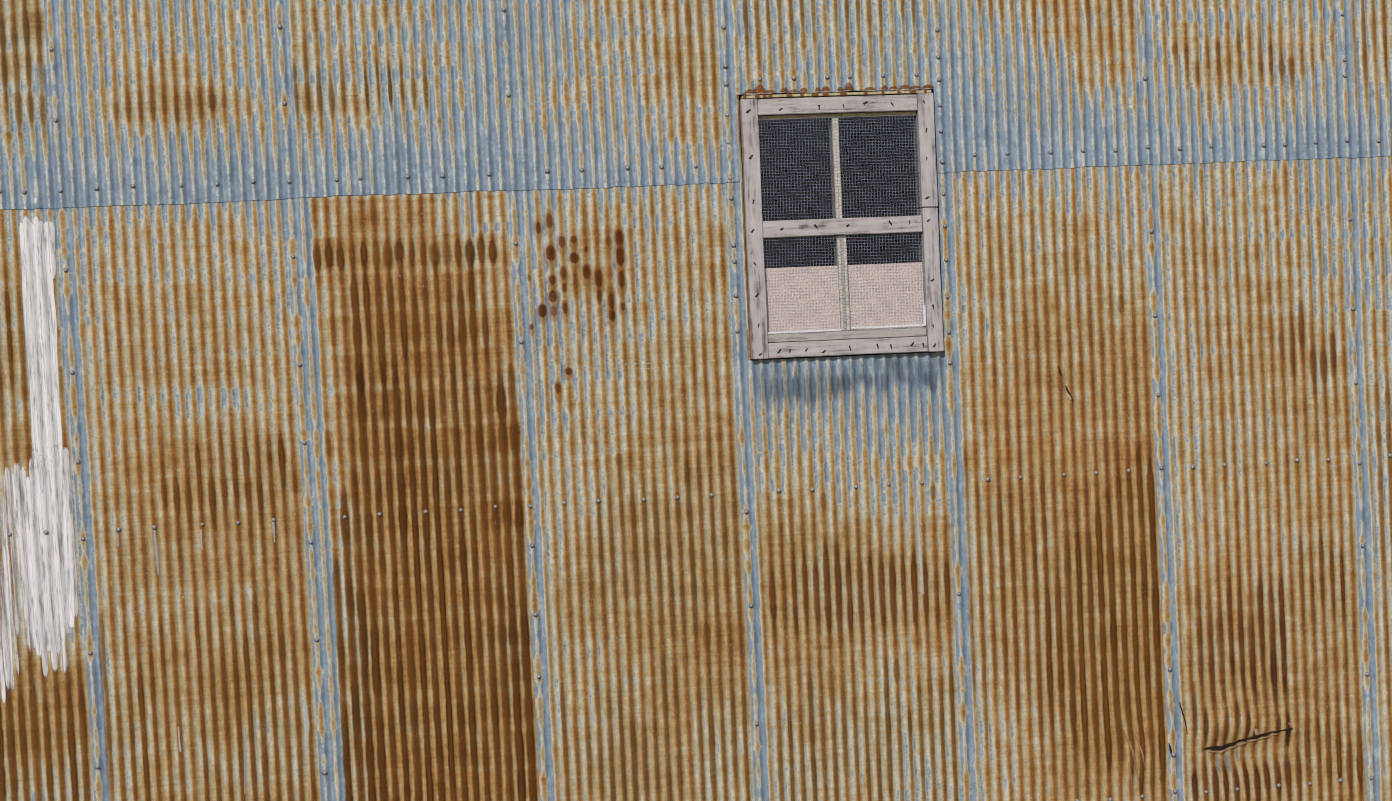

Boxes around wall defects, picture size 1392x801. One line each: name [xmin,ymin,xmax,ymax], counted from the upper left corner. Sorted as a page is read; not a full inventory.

corrosion [530,214,625,329]
corrosion [196,446,216,522]
corrosion [336,238,537,801]
corrosion [792,545,853,630]
corrosion [868,555,927,625]
corrosion [1046,455,1166,793]
corrosion [1227,583,1287,692]
corrosion [138,661,152,801]
corrosion [233,637,276,801]
crack [1169,702,1293,757]
corrosion [1192,762,1291,801]
corrosion [1327,727,1363,785]